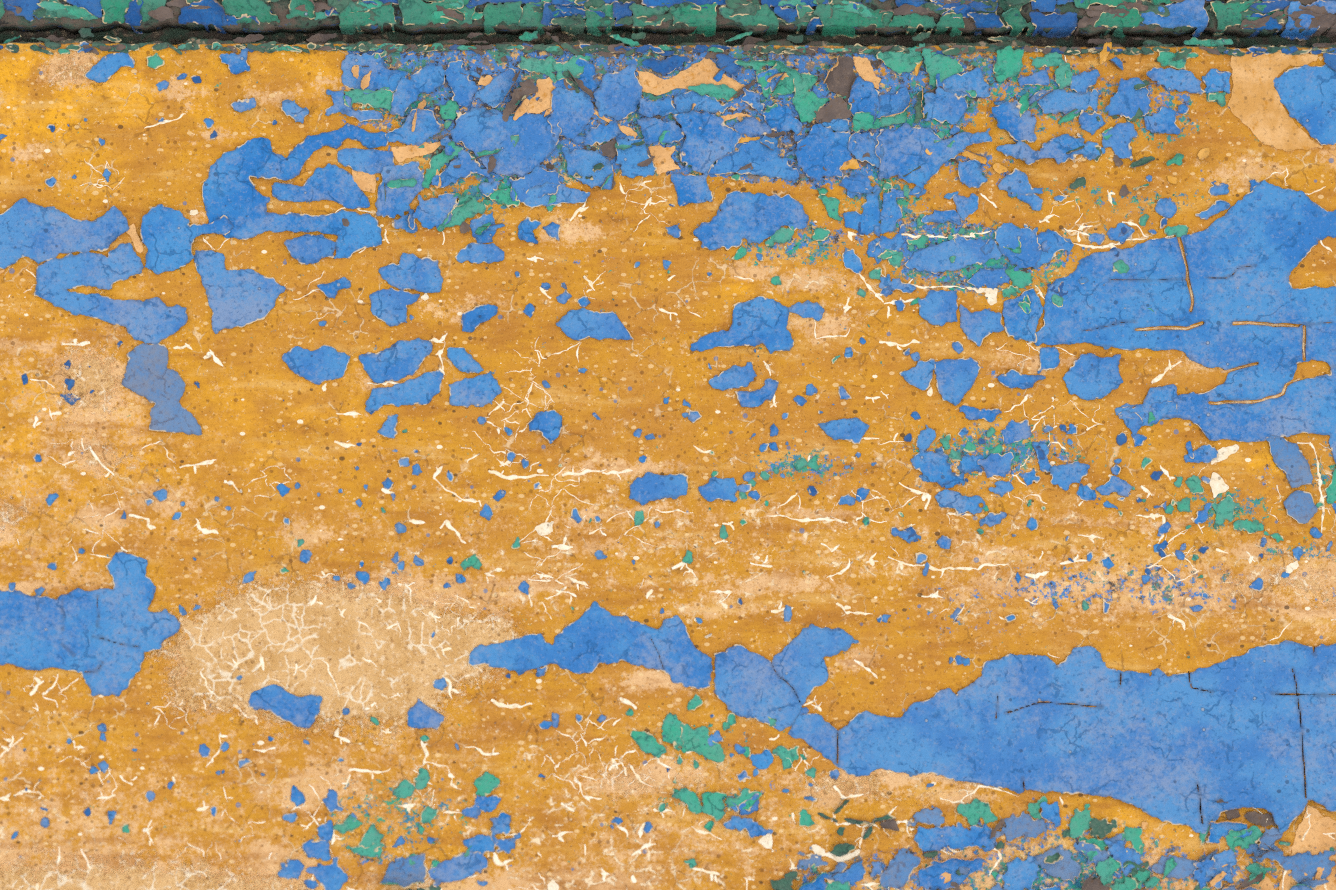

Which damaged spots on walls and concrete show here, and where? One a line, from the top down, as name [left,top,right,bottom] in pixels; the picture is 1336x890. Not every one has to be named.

peeling [0,0,1336,614]
crack [381,333,773,620]
crack [769,190,1305,624]
crack [0,638,137,803]
peeling [0,551,201,696]
peeling [248,684,323,745]
crack [114,638,499,890]
peeling [278,768,521,890]
peeling [407,698,444,742]
crack [417,697,723,890]
crack [769,669,915,848]
peeling [468,601,1336,890]